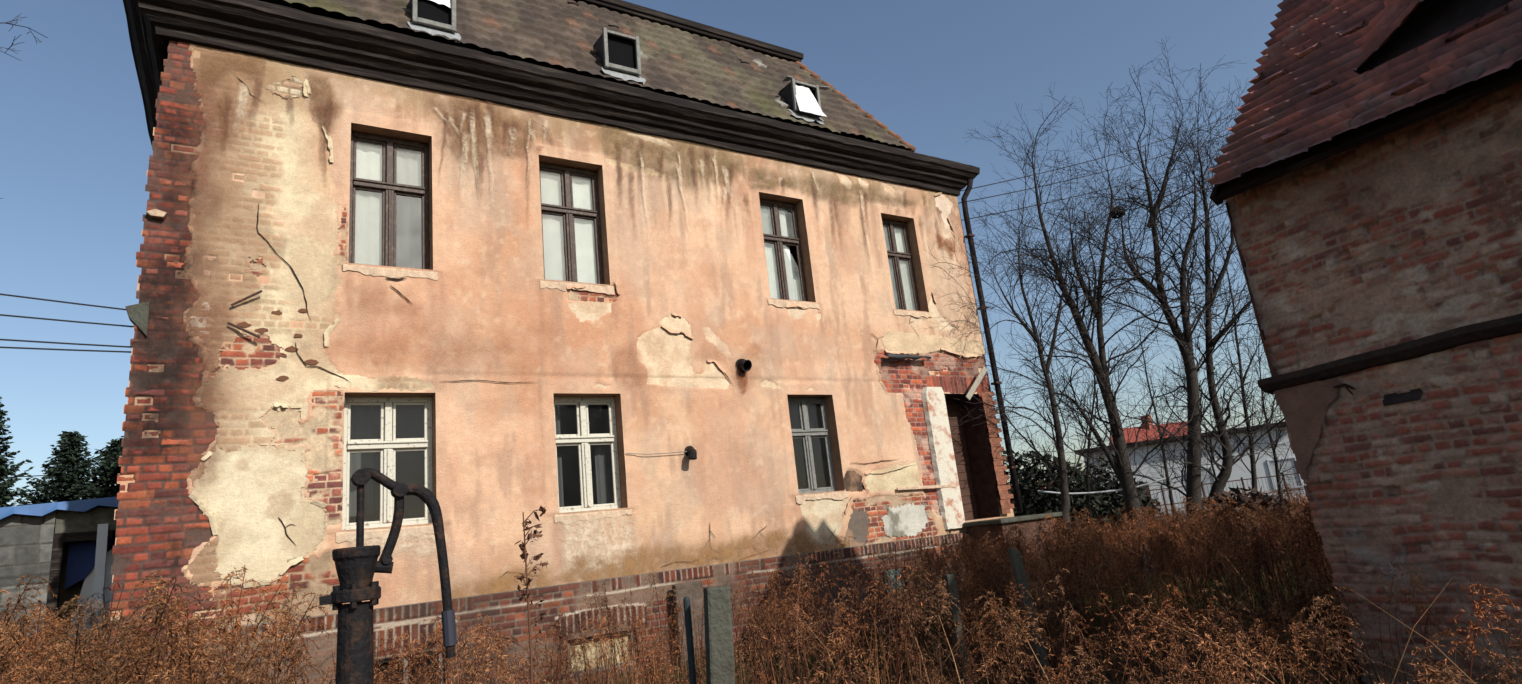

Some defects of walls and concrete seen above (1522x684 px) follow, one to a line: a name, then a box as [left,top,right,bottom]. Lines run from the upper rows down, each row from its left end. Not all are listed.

water stain [312,77,340,126]
water stain [435,99,547,171]
flaking render [109,41,434,642]
crack [257,203,350,382]
flaking render [566,282,621,322]
flaking render [637,313,731,389]
flaking render [800,292,1012,548]
flaking render [1274,378,1341,479]